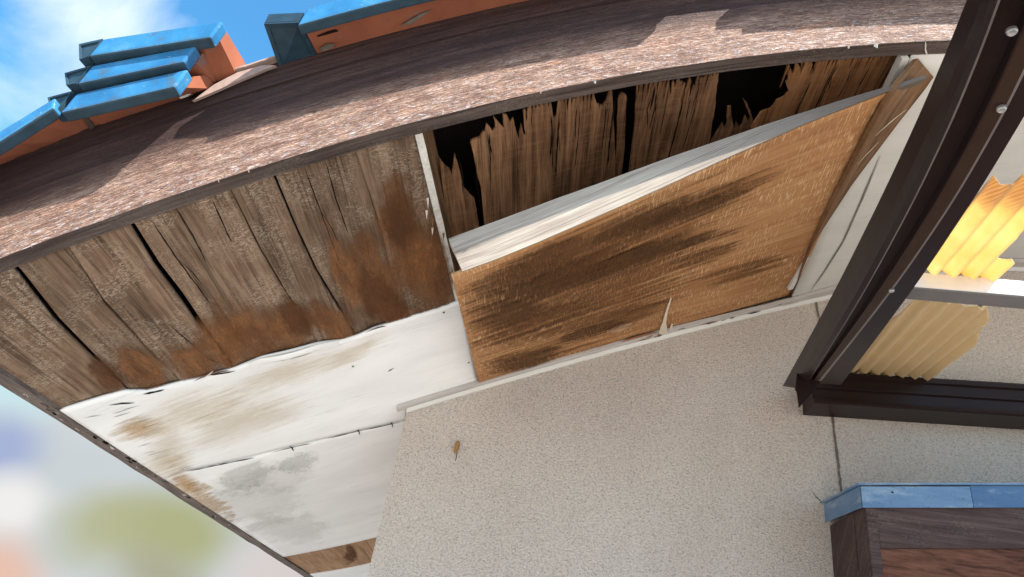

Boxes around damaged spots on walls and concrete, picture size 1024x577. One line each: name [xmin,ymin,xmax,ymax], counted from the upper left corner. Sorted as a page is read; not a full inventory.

crack [153,210,212,306]
crack [212,200,232,243]
damp [88,177,452,391]
crack [305,161,368,277]
damp [466,168,784,375]
crack [169,324,234,381]
crack [812,417,843,501]